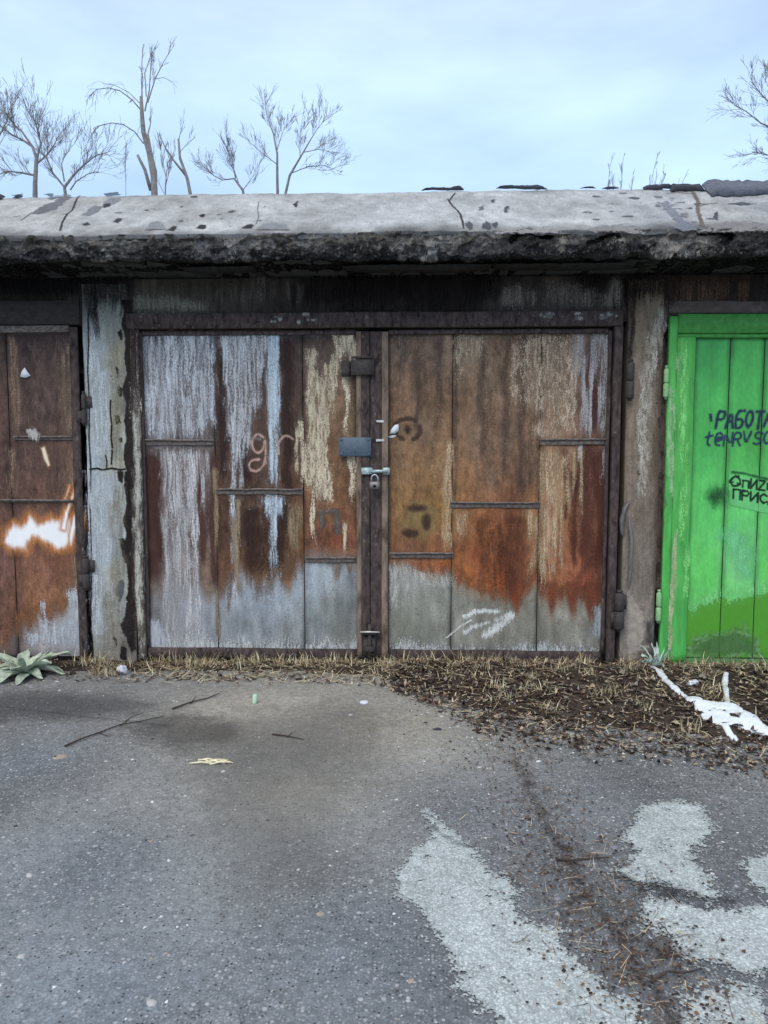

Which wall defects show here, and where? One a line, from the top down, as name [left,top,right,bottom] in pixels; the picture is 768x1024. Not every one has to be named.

crack [59,195,80,231]
spalling [190,210,262,262]
spalling [391,240,439,261]
crack [448,193,464,228]
spalling [650,196,719,258]
peeling [294,335,357,545]
corrosion [0,334,77,648]
corrosion [128,329,357,636]
corrosion [389,334,607,621]
peeling [154,628,357,649]